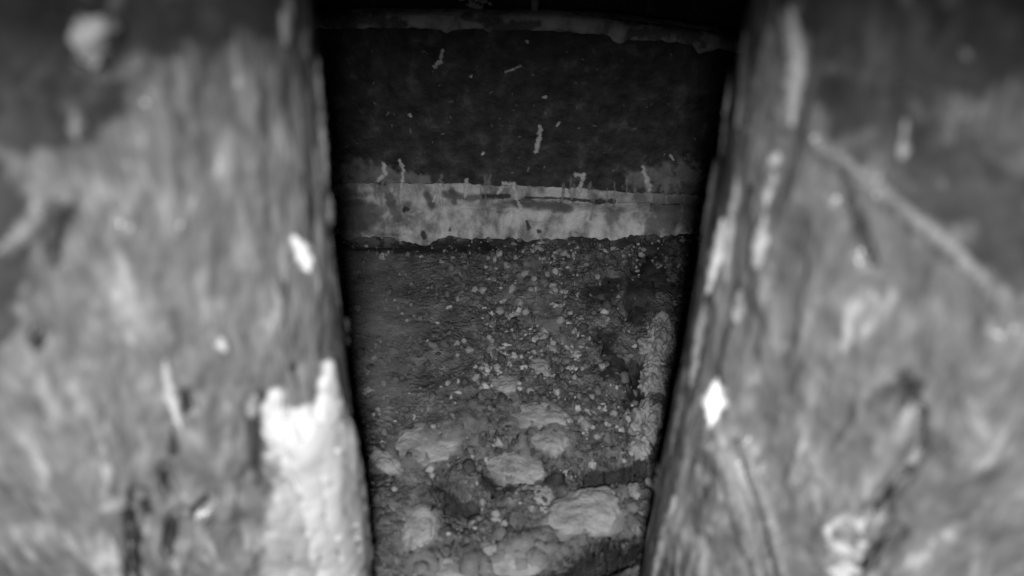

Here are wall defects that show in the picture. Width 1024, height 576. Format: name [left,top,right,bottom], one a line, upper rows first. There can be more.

water stain [0,0,586,344]
water stain [435,484,480,521]
water stain [481,472,565,499]